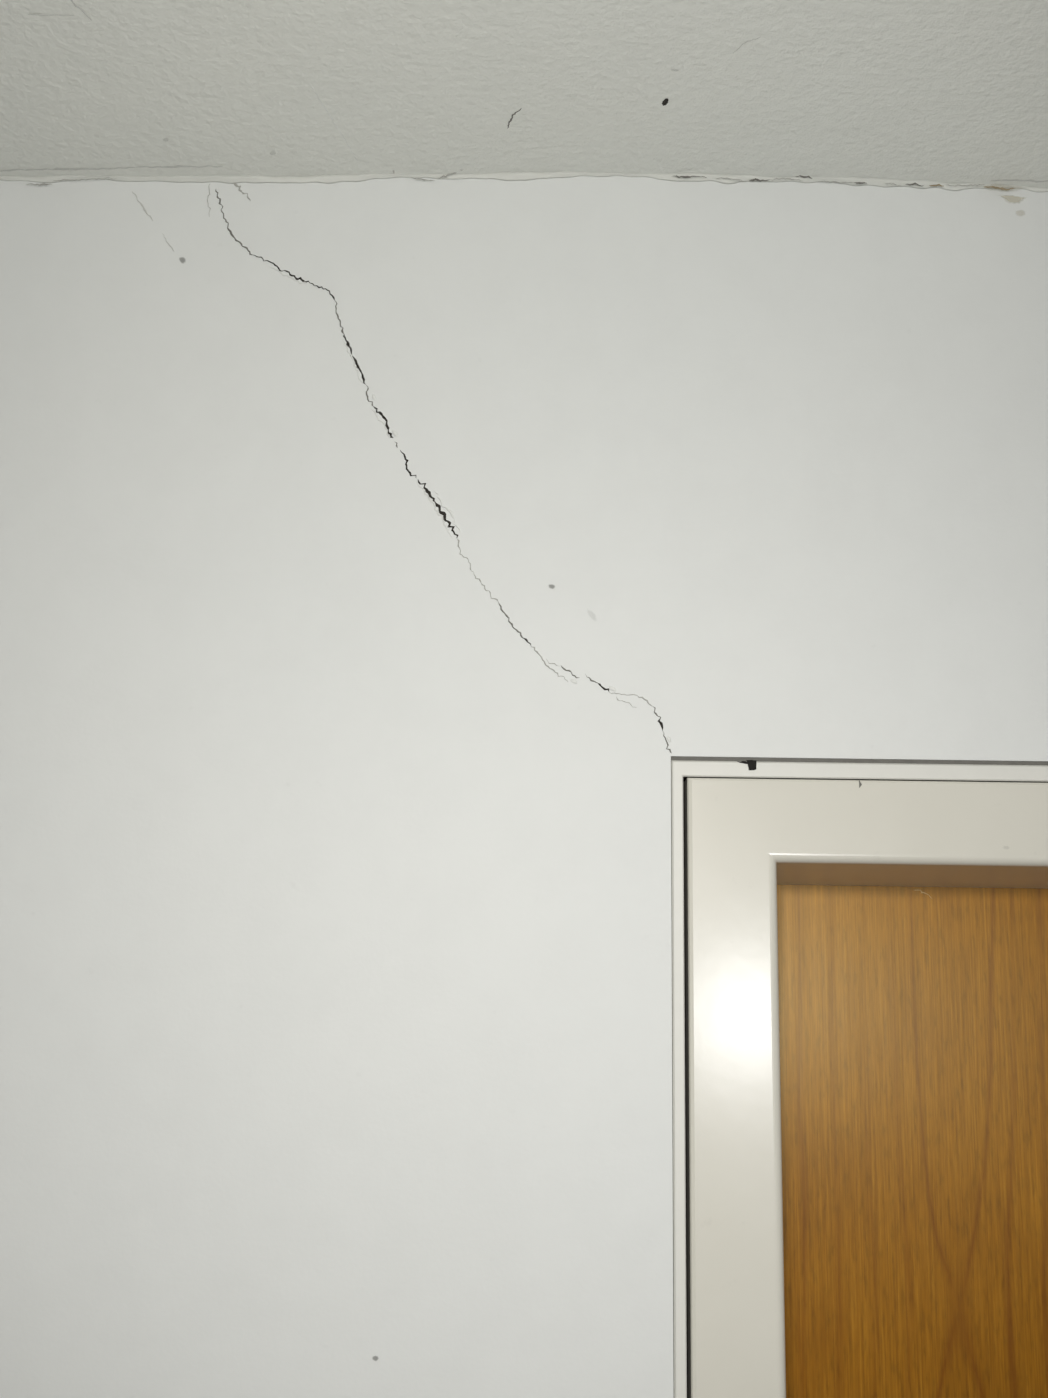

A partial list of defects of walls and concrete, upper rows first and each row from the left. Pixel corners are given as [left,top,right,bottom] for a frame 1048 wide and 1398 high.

crack [0,165,672,754]